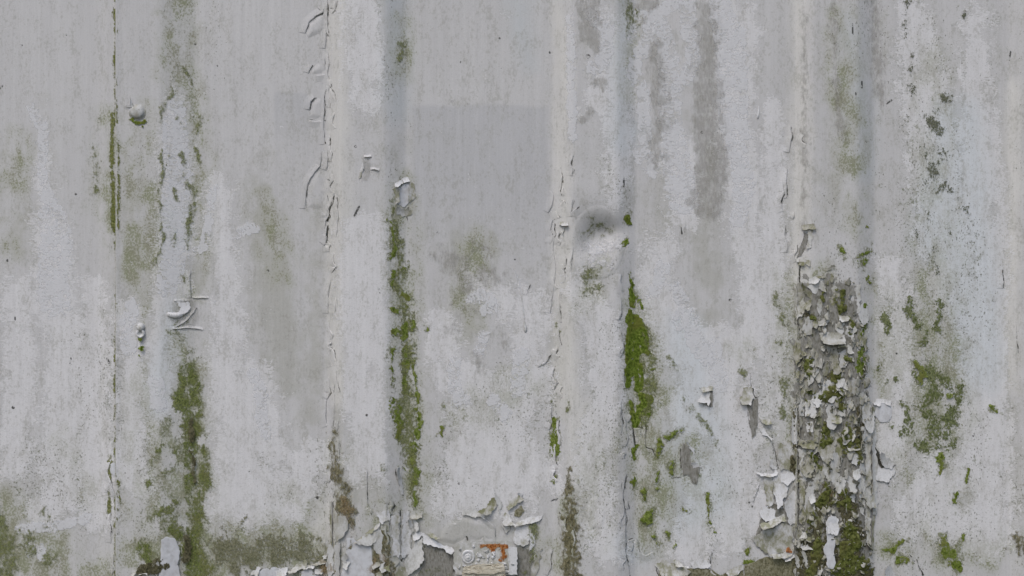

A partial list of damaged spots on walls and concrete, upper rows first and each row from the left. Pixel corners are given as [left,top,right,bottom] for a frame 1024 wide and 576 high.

peeling [167,270,209,330]
crack [299,0,340,549]
peeling [654,223,896,576]
damp [188,414,197,484]
peeling [131,537,180,576]
corrosion [480,543,508,562]
peeling [461,490,543,576]